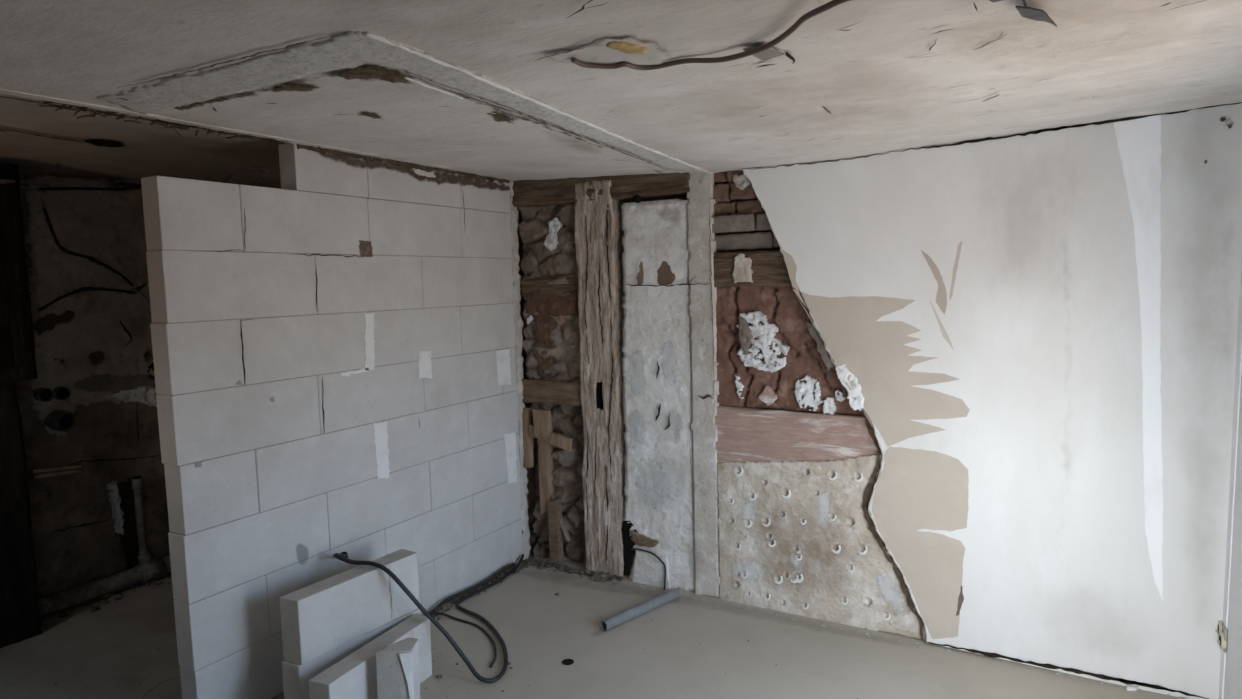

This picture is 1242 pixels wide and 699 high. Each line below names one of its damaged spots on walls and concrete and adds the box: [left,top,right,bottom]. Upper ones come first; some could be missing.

peeling [729,169,969,640]